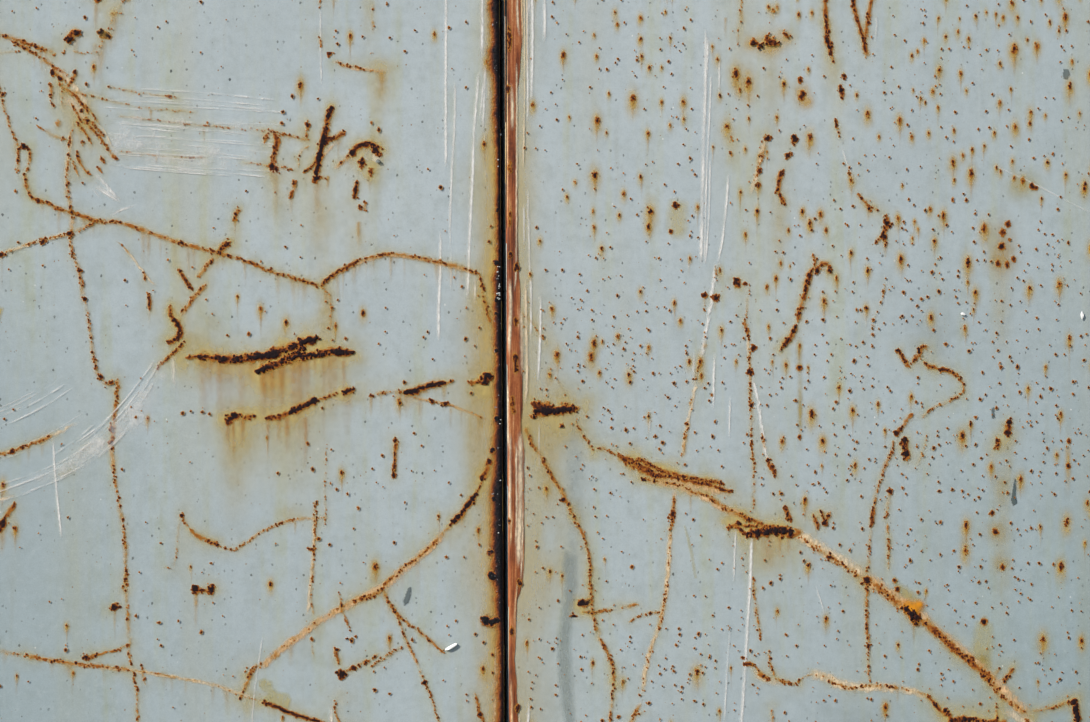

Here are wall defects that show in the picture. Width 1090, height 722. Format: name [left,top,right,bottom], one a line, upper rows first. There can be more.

corrosion [61,0,125,70]
corrosion [349,142,384,178]
corrosion [176,319,357,437]
corrosion [467,0,533,722]
corrosion [545,400,573,432]
corrosion [627,453,711,495]
corrosion [723,509,801,543]
corrosion [571,598,638,617]
corrosion [892,578,927,612]
corrosion [927,694,1006,722]